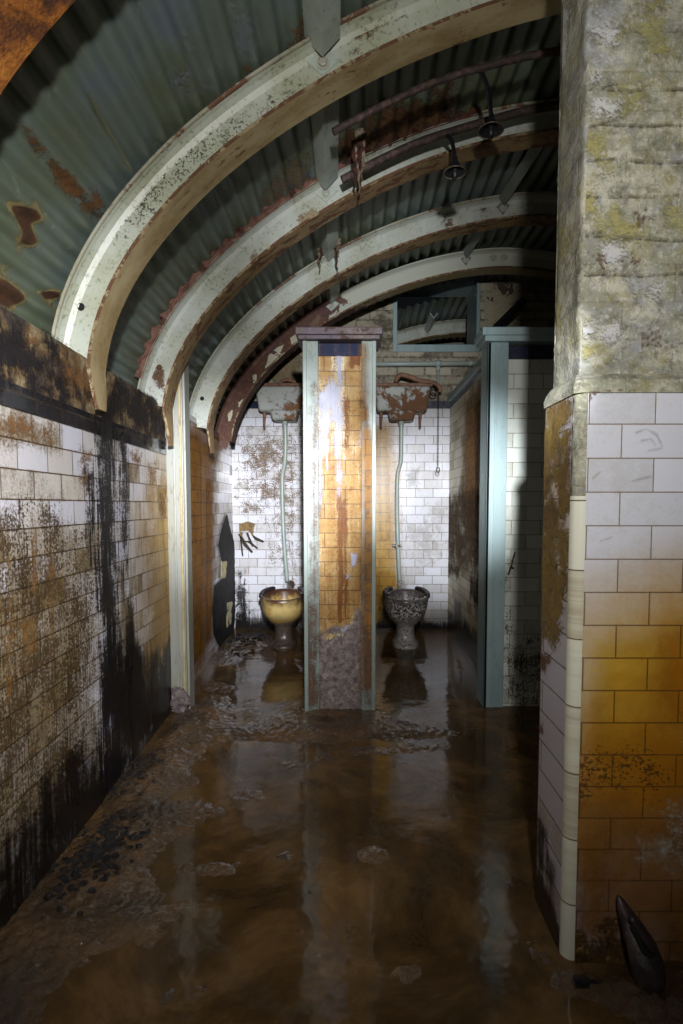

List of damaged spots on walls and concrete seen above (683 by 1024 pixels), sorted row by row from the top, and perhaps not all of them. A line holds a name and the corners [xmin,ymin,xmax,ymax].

rust [22,126,106,221]
rust [338,81,460,195]
rust [0,199,62,312]
rust [152,365,165,392]
damp [233,419,304,589]
rust [308,351,372,709]
damp [0,320,172,930]
spalling [319,607,361,709]
damp [578,590,683,818]